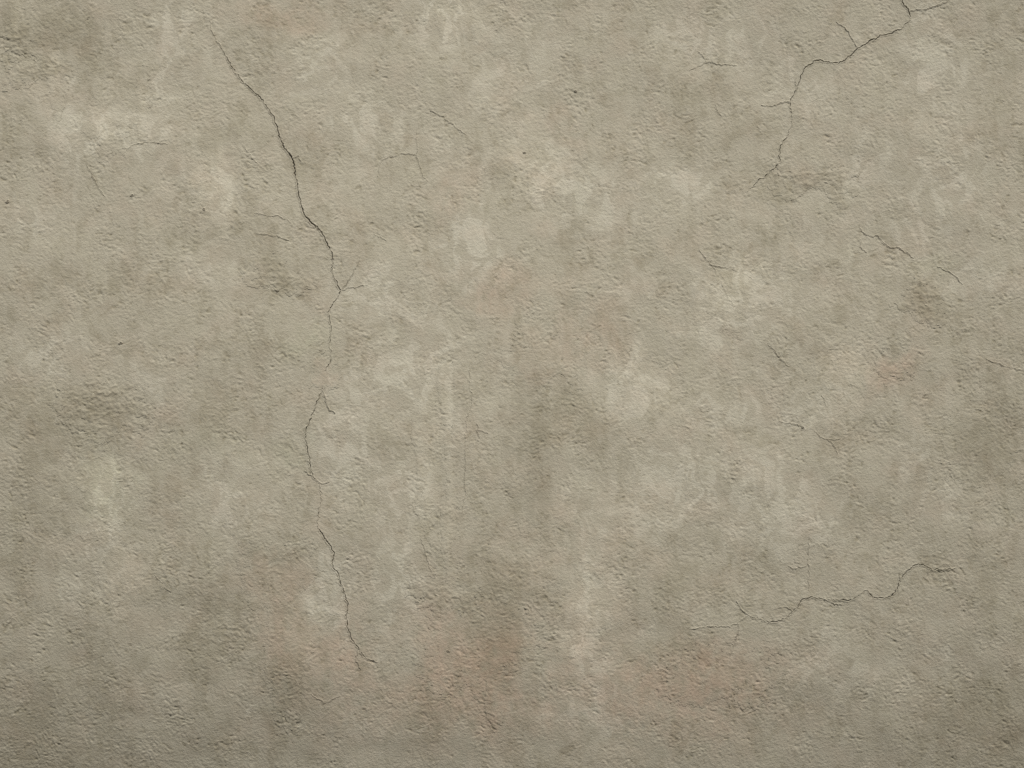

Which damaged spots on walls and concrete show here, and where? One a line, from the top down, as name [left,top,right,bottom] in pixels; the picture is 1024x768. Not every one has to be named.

crack [747,0,948,191]
crack [210,20,378,669]
crack [690,536,956,664]